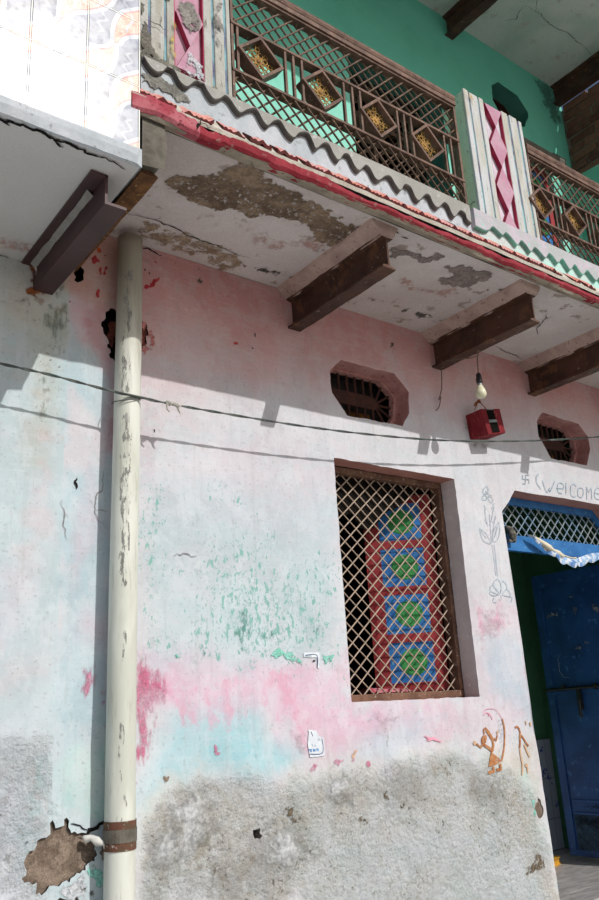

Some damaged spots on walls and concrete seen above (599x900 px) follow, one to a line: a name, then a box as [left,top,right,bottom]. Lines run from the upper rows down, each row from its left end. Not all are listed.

peeling [140,3,181,72]
peeling [178,1,201,33]
flaking render [142,73,191,103]
peeling [165,162,360,247]
peeling [389,247,503,291]
hole [101,313,116,361]
flaking render [141,322,155,354]
flaking render [22,818,104,900]